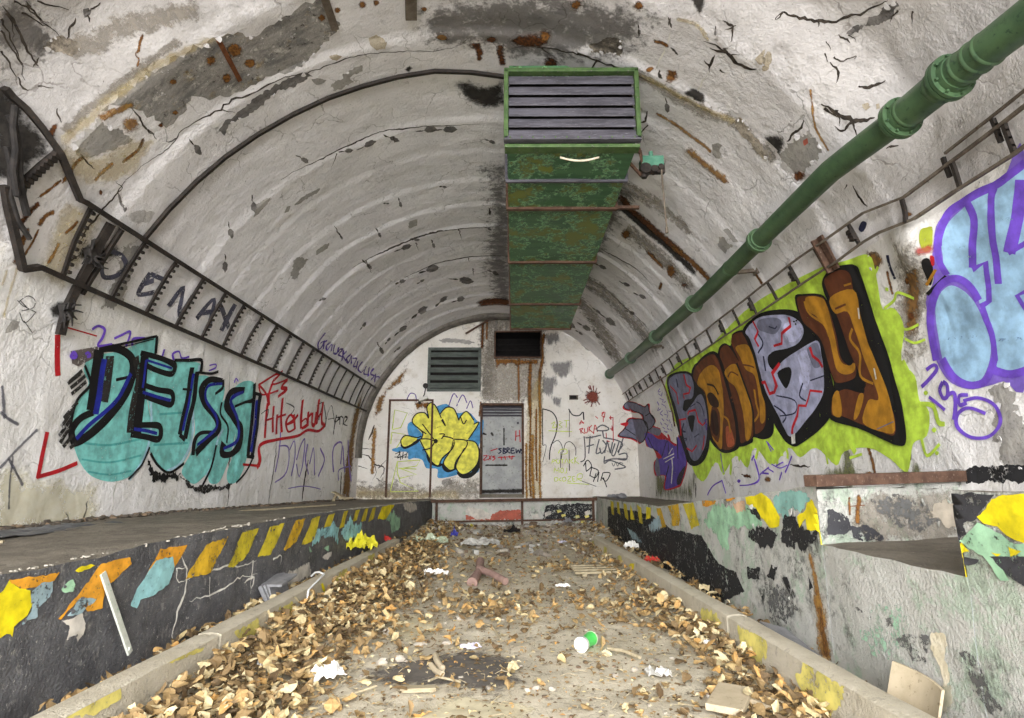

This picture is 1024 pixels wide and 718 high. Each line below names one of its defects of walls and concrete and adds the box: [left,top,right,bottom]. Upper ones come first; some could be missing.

crack [0,0,69,122]
flaking render [71,0,363,159]
rust [471,29,550,65]
crack [704,21,756,73]
crack [775,0,914,142]
rust [13,103,145,264]
crack [71,41,475,261]
rust [656,113,729,184]
flaking render [733,117,822,176]
rust [495,333,545,498]
peeling [871,494,956,533]
rust [808,553,831,661]